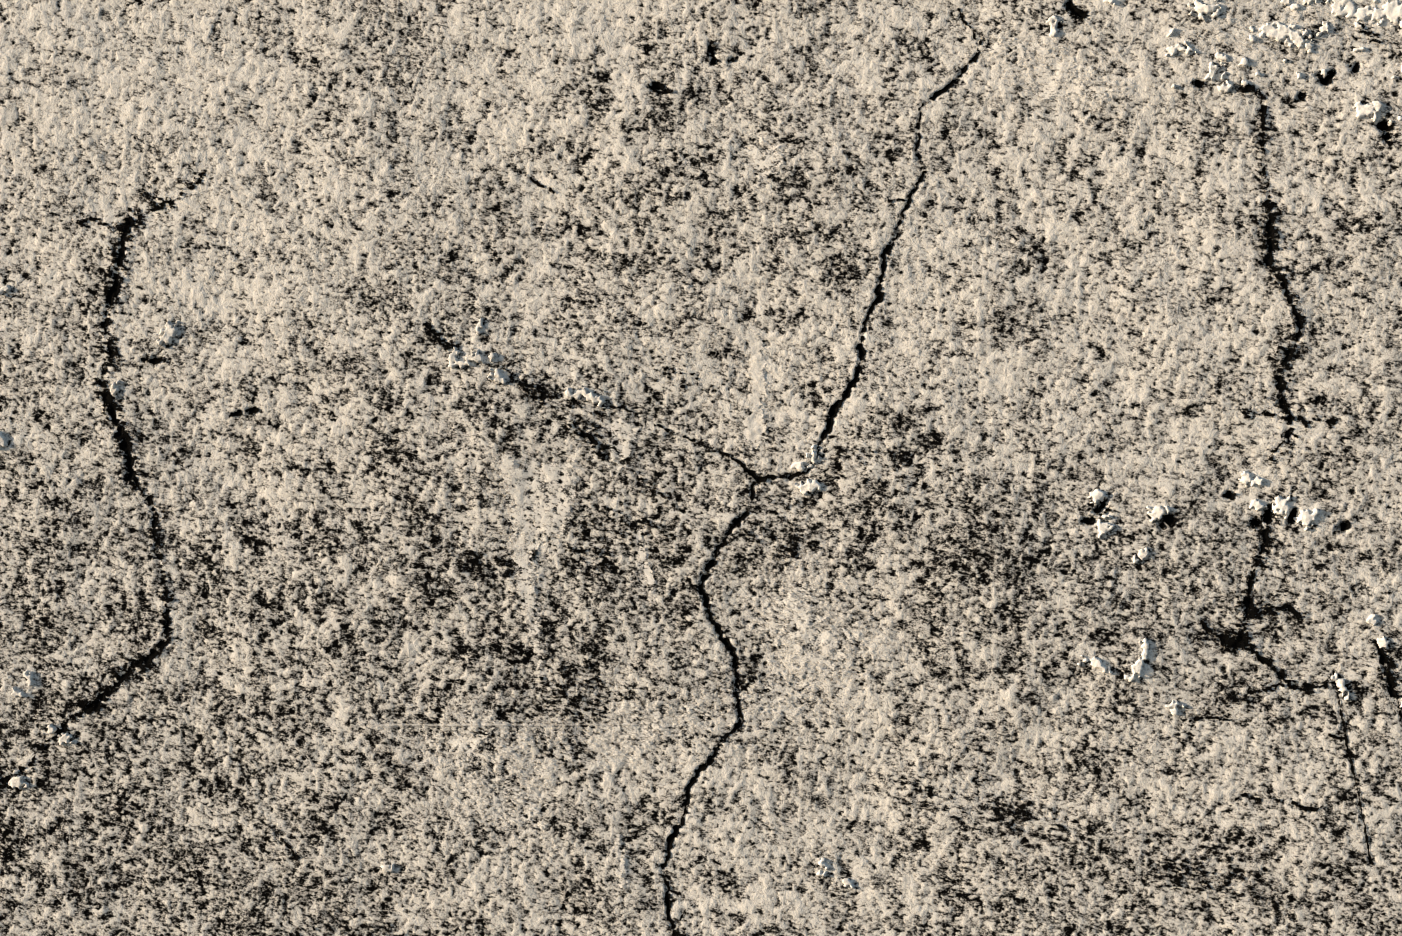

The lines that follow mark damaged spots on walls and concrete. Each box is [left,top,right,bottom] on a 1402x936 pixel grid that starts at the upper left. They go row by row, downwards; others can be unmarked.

crack [0,162,206,797]
crack [422,8,982,936]
crack [1189,77,1402,865]